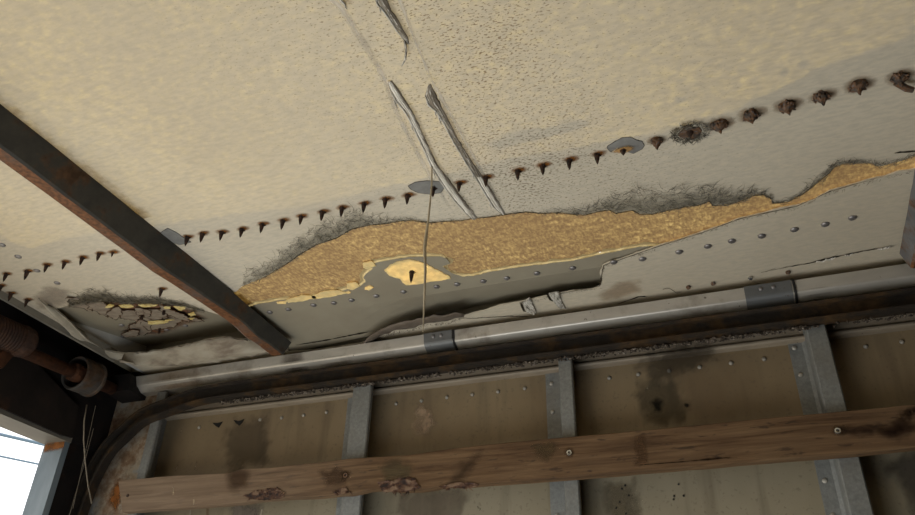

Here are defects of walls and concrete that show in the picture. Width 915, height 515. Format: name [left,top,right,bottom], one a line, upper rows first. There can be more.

crack [375,0,505,220]
peeling [607,137,645,156]
peeling [234,152,915,307]